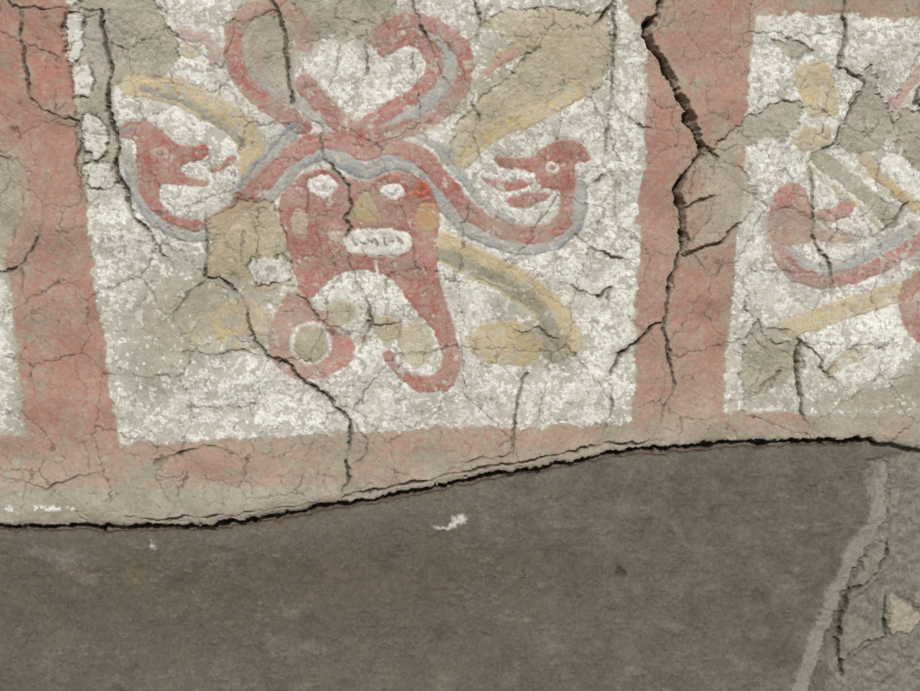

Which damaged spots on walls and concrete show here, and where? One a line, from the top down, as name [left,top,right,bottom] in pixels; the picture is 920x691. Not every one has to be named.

crack [912,85,920,108]
crack [874,200,910,237]
crack [0,0,880,534]
peeling [0,504,81,513]
spalling [791,449,920,691]